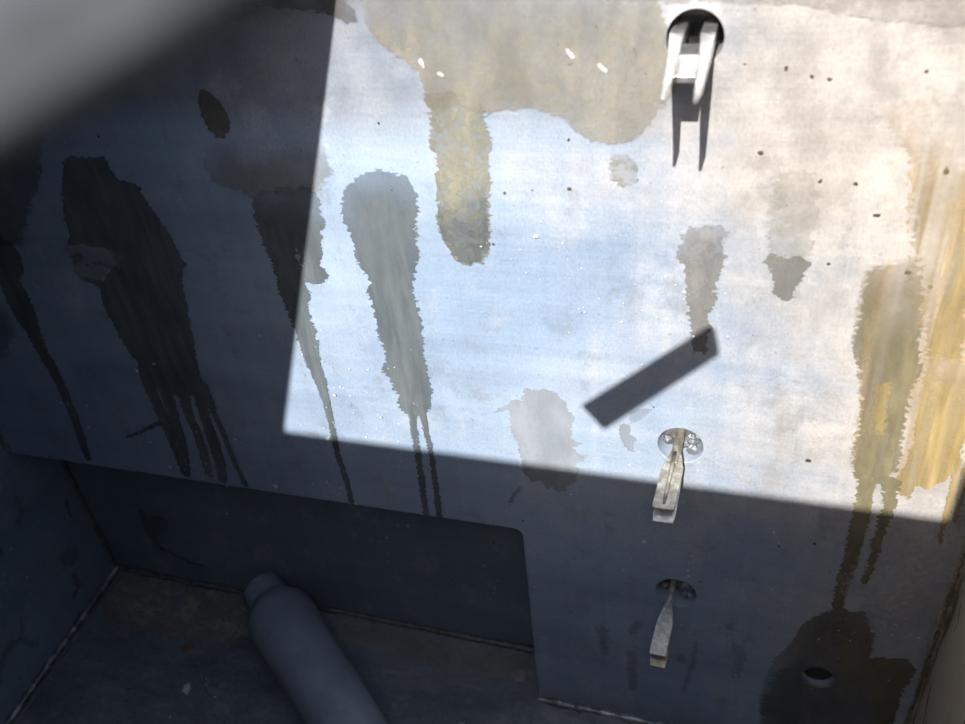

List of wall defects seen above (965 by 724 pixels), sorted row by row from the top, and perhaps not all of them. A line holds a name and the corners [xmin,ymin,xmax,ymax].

damp [0,236,92,461]
damp [60,156,248,487]
damp [252,189,355,505]
damp [341,185,443,518]
damp [424,92,493,266]
damp [677,237,727,355]
damp [763,253,811,301]
rust [830,190,965,622]
damp [780,609,917,724]